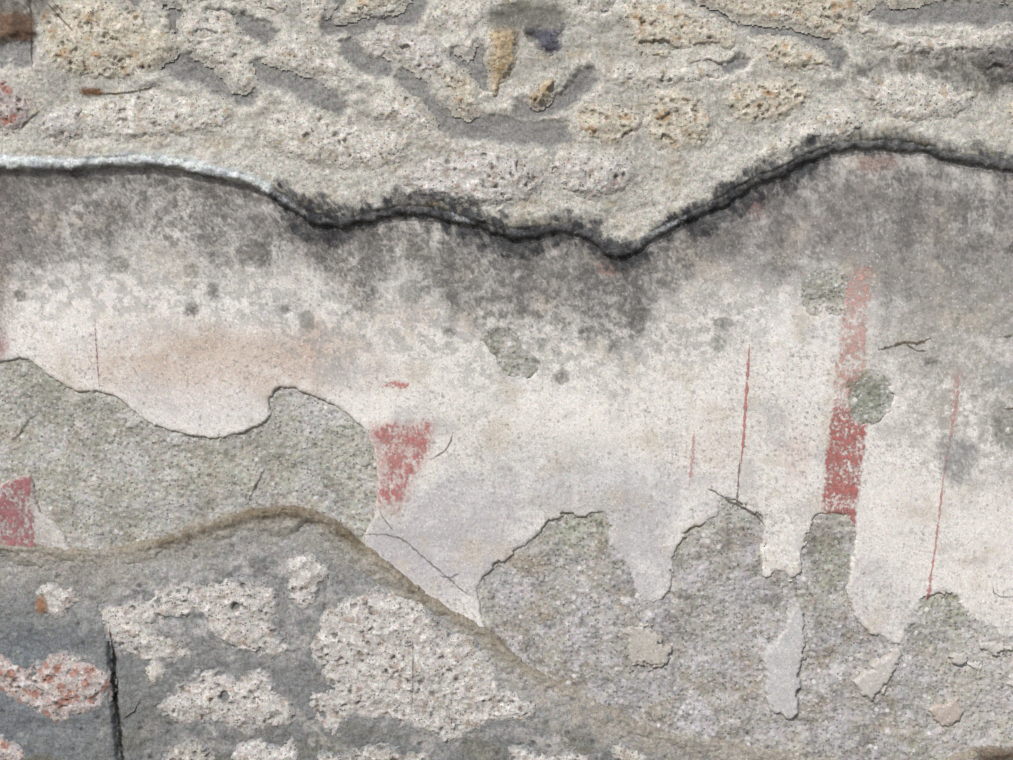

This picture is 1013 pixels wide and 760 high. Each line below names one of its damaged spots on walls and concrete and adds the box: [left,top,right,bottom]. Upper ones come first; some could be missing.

damp [0,130,1013,349]
flaking render [0,359,378,549]
flaking render [845,369,894,427]
flaking render [991,411,1013,447]
crack [109,629,140,760]
flaking render [477,498,1013,760]